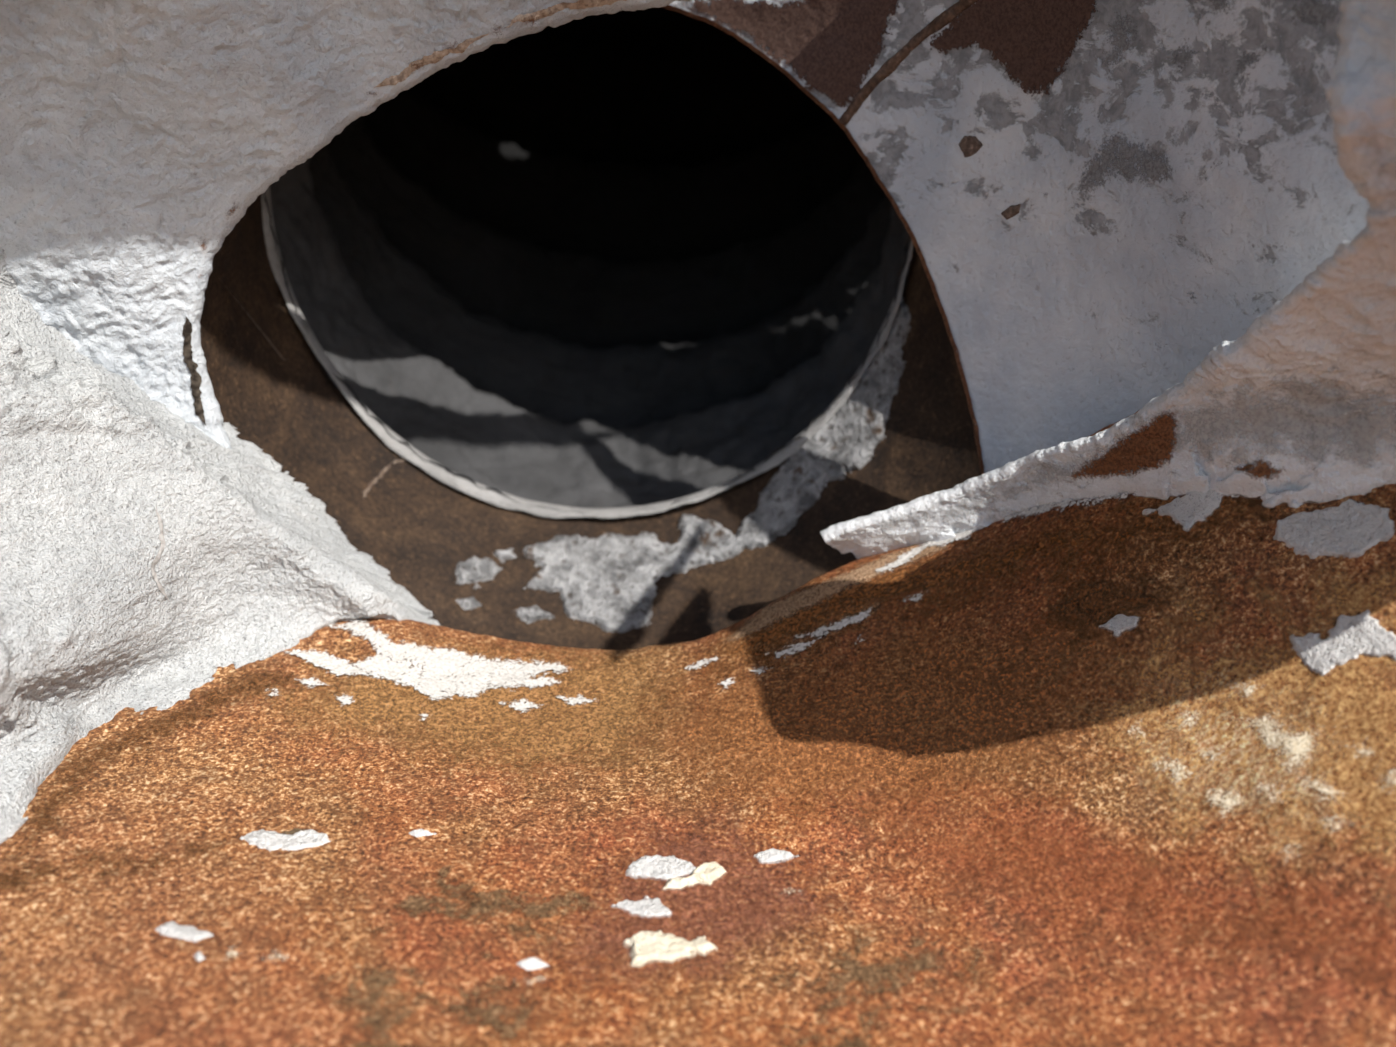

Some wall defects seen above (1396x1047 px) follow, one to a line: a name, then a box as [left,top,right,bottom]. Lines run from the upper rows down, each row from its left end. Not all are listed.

peeling [694,0,900,108]
crack [182,277,287,426]
peeling [455,297,911,633]
corrosion [1235,460,1281,480]
peeling [1273,499,1395,559]
peeling [285,620,596,720]
corrosion [268,652,664,767]
corrosion [674,494,1396,853]
peeling [1289,609,1396,676]
peeling [240,828,331,851]
peeling [155,921,214,961]
peeling [610,855,727,967]